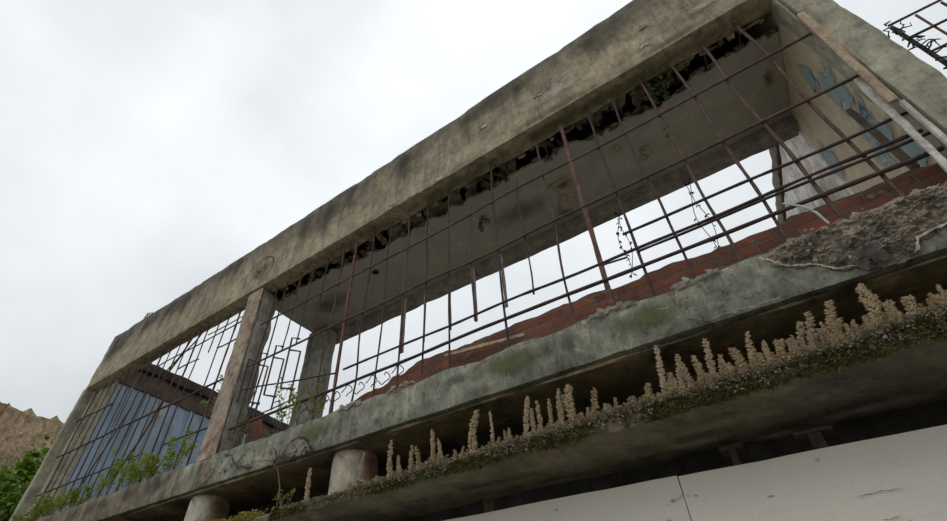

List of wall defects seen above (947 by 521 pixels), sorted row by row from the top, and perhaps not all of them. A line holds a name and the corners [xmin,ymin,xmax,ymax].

peeling [799,63,928,167]
spalling [757,181,947,270]